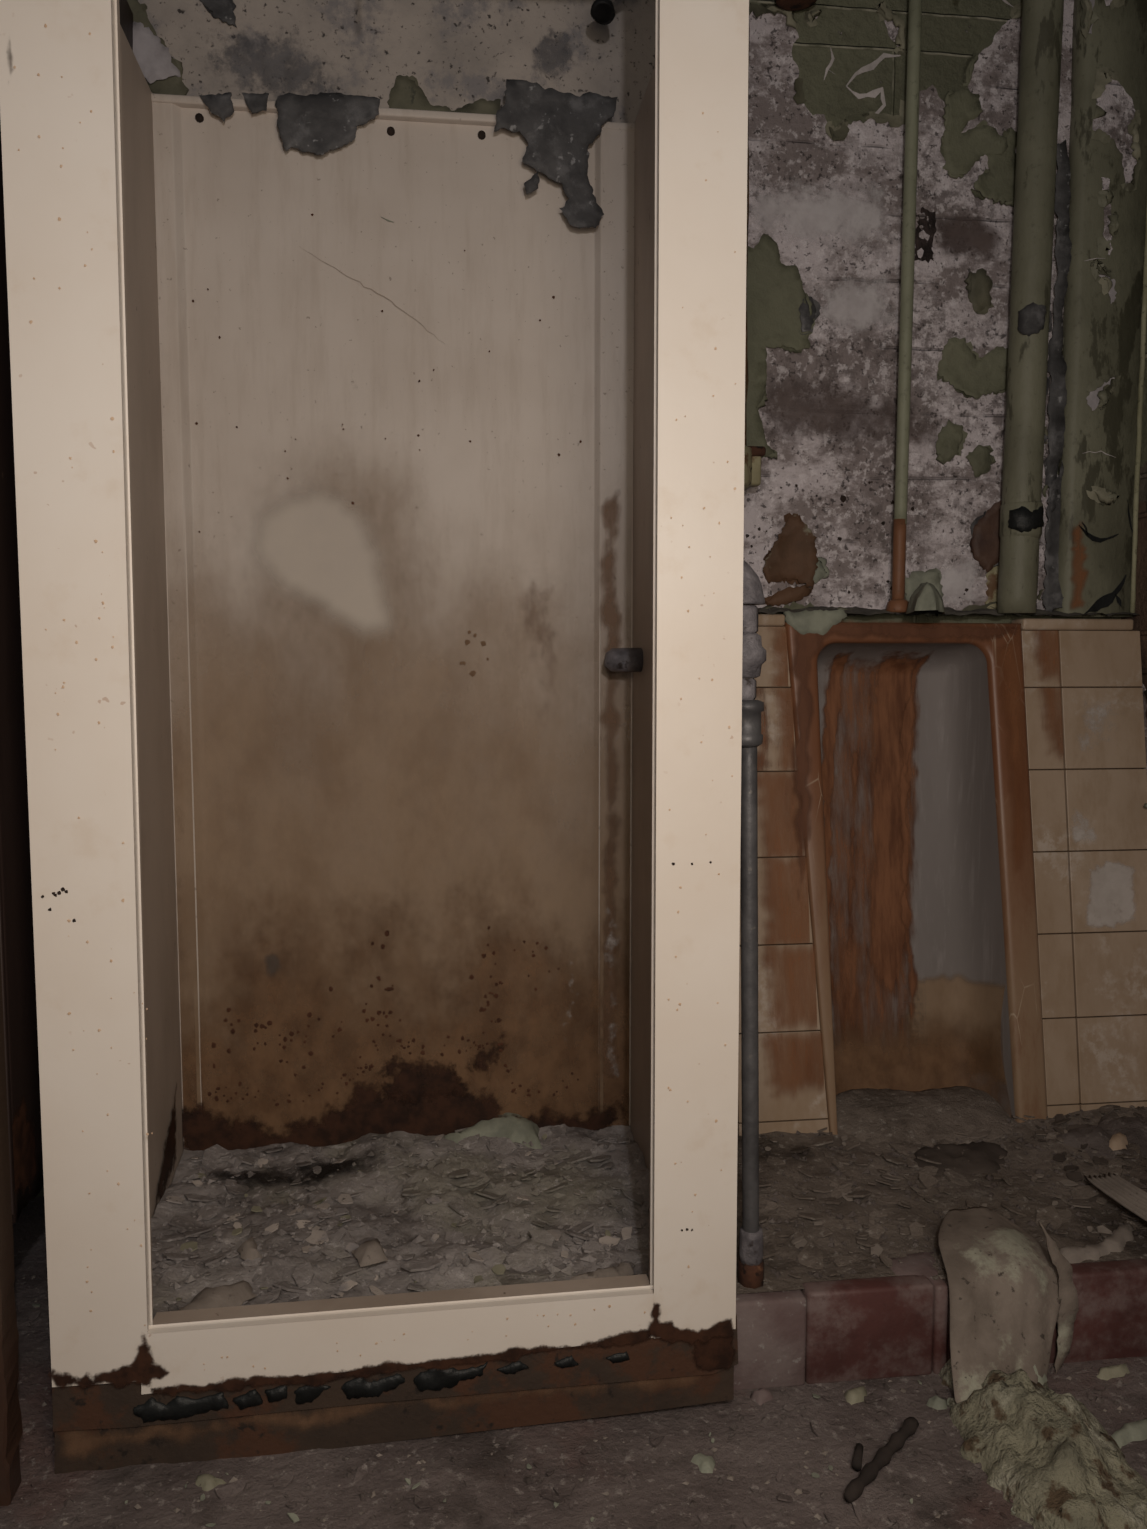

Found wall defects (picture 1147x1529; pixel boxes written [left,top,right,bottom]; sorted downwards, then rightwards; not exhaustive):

peeling [138,0,655,123]
peeling [1055,0,1142,304]
peeling [743,1,1066,619]
peeling [1085,375,1122,411]
peeling [1086,486,1120,506]
corrosion [1038,630,1064,753]
corrosion [756,622,1018,1090]
corrosion [49,1304,735,1397]